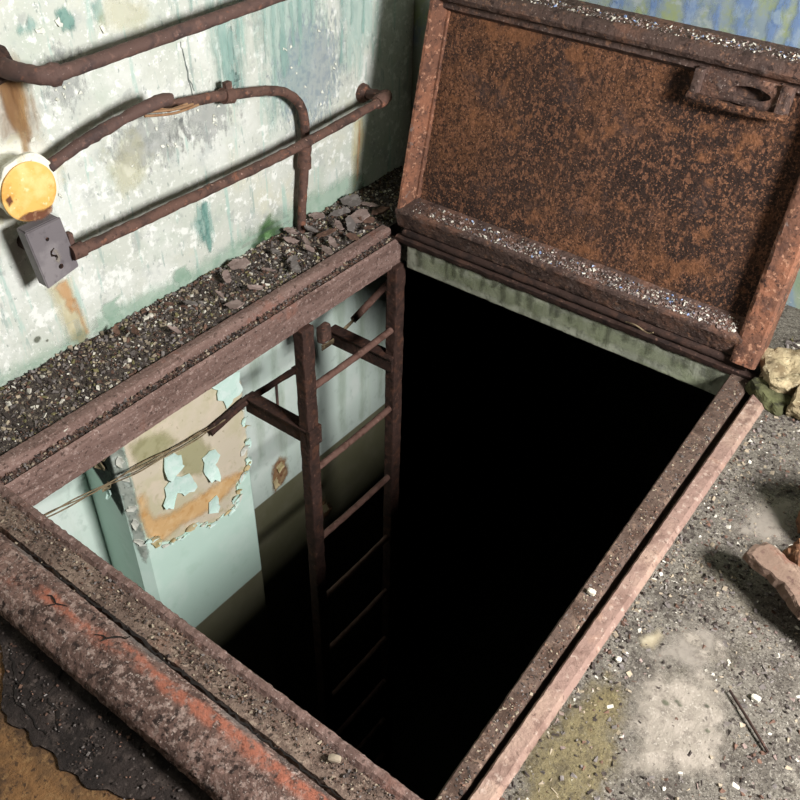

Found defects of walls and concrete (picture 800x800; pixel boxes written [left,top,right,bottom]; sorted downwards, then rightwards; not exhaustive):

corrosion [0,80,30,151]
corrosion [55,282,86,343]
peeling [92,372,252,562]
peeling [272,458,288,492]